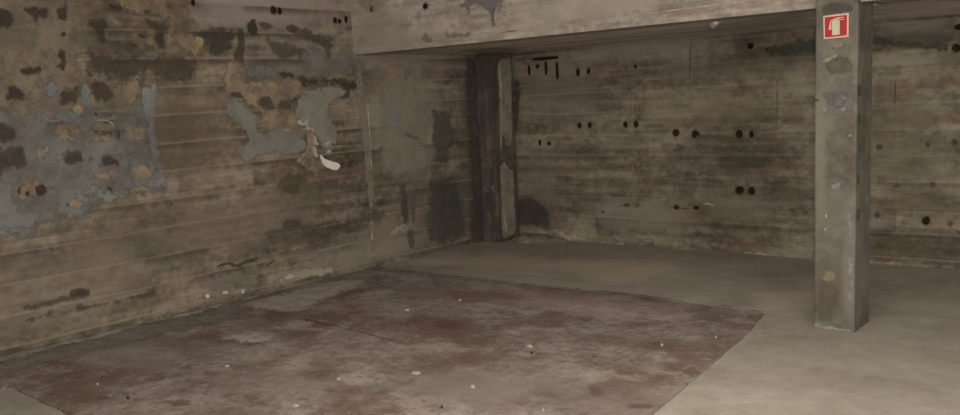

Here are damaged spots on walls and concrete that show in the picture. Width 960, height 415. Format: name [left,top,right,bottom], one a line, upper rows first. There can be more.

peeling [0,0,204,241]
water stain [86,52,195,81]
peeling [223,62,346,180]
water stain [460,0,503,26]
water stain [389,48,586,248]